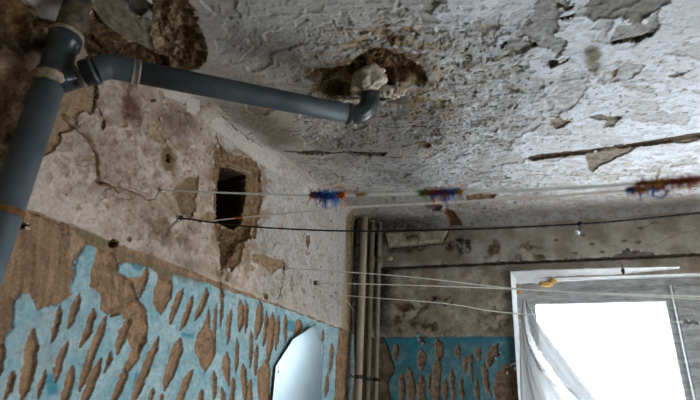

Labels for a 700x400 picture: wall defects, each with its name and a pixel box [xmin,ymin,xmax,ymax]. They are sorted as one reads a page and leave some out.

crack [62,84,161,201]
spalling [83,0,209,71]
crack [284,150,402,158]
spalling [304,0,695,163]
peeling [672,134,700,144]
flaking render [0,146,518,400]